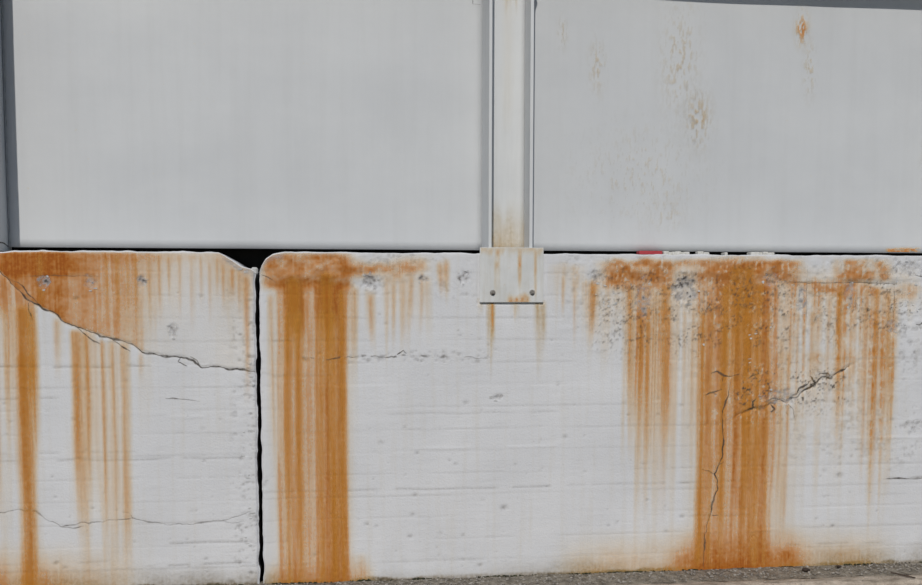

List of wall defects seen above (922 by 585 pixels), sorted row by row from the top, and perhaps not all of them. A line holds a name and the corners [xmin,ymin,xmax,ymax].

rust [0,252,149,585]
crack [0,271,256,372]
rust [265,254,416,583]
rust [606,259,687,406]
crack [702,368,846,567]
rust [668,260,887,571]
rust [869,310,894,409]